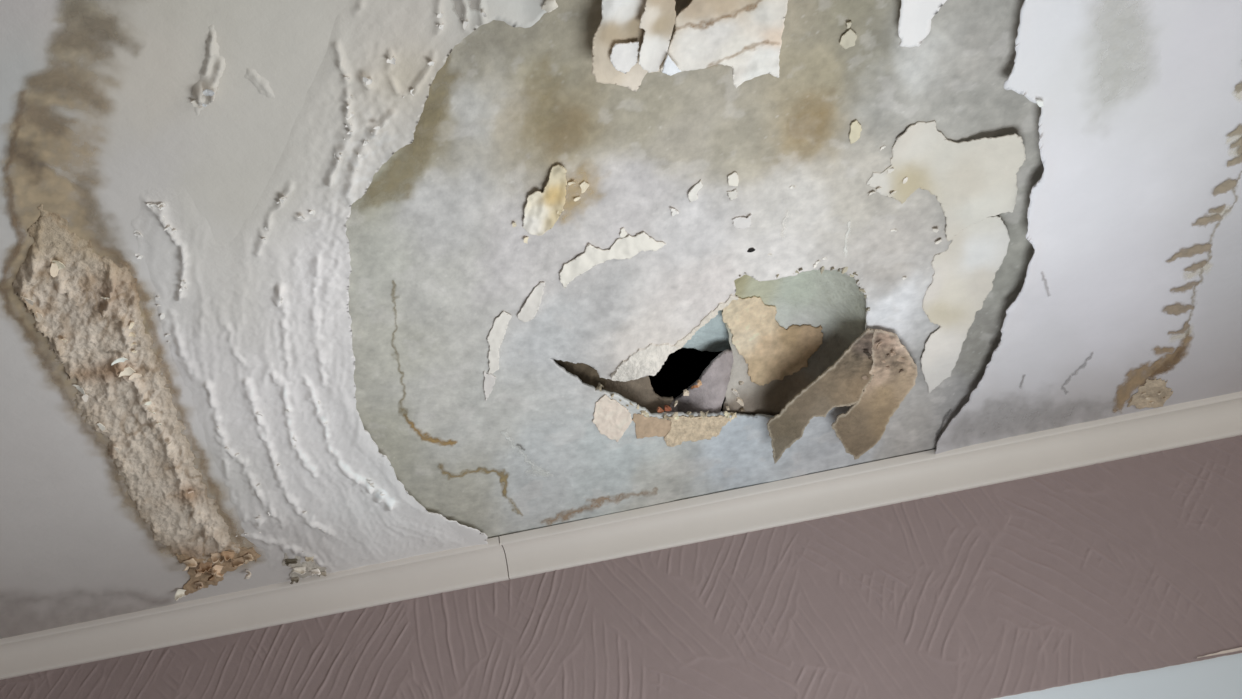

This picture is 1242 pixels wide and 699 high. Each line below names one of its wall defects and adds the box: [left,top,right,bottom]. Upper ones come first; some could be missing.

leakage [0,0,174,418]
spalling [12,204,254,601]
leakage [192,455,253,549]
crack [393,281,521,514]
peeling [345,0,1044,539]
leakage [1113,125,1242,412]